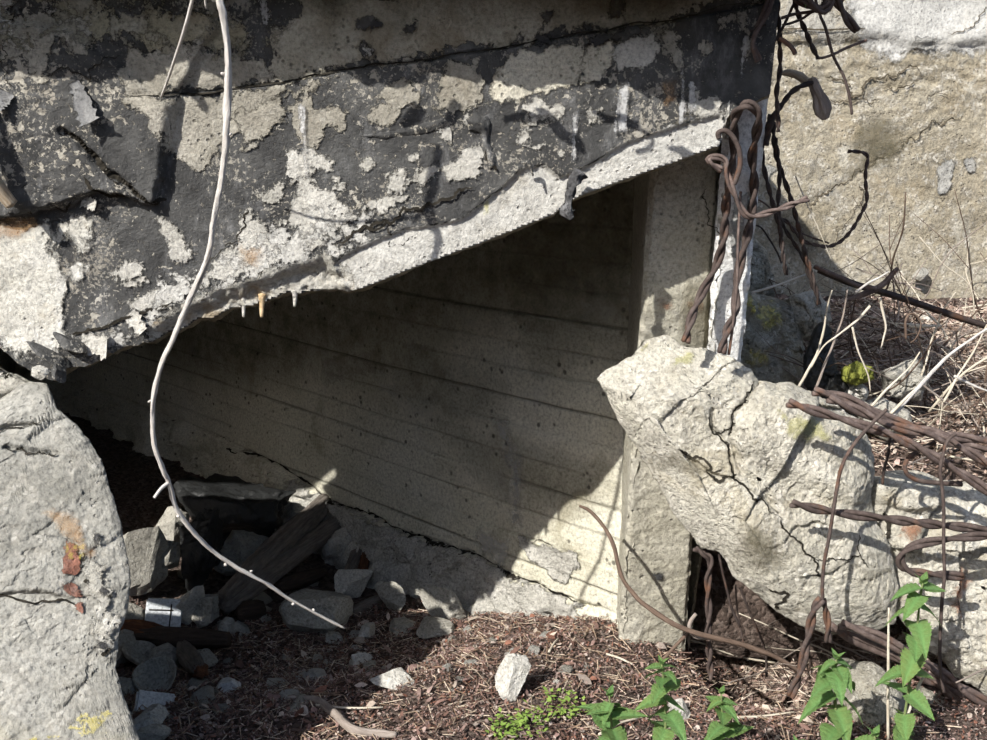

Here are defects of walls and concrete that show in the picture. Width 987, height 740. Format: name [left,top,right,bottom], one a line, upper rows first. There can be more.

crack [138,1,765,96]
peeling [717,7,752,58]
crack [55,131,167,213]
peeling [0,0,728,349]
crack [800,64,966,251]
spalling [730,193,749,258]
crack [679,381,869,577]
spalling [281,479,584,620]
crack [769,589,790,609]